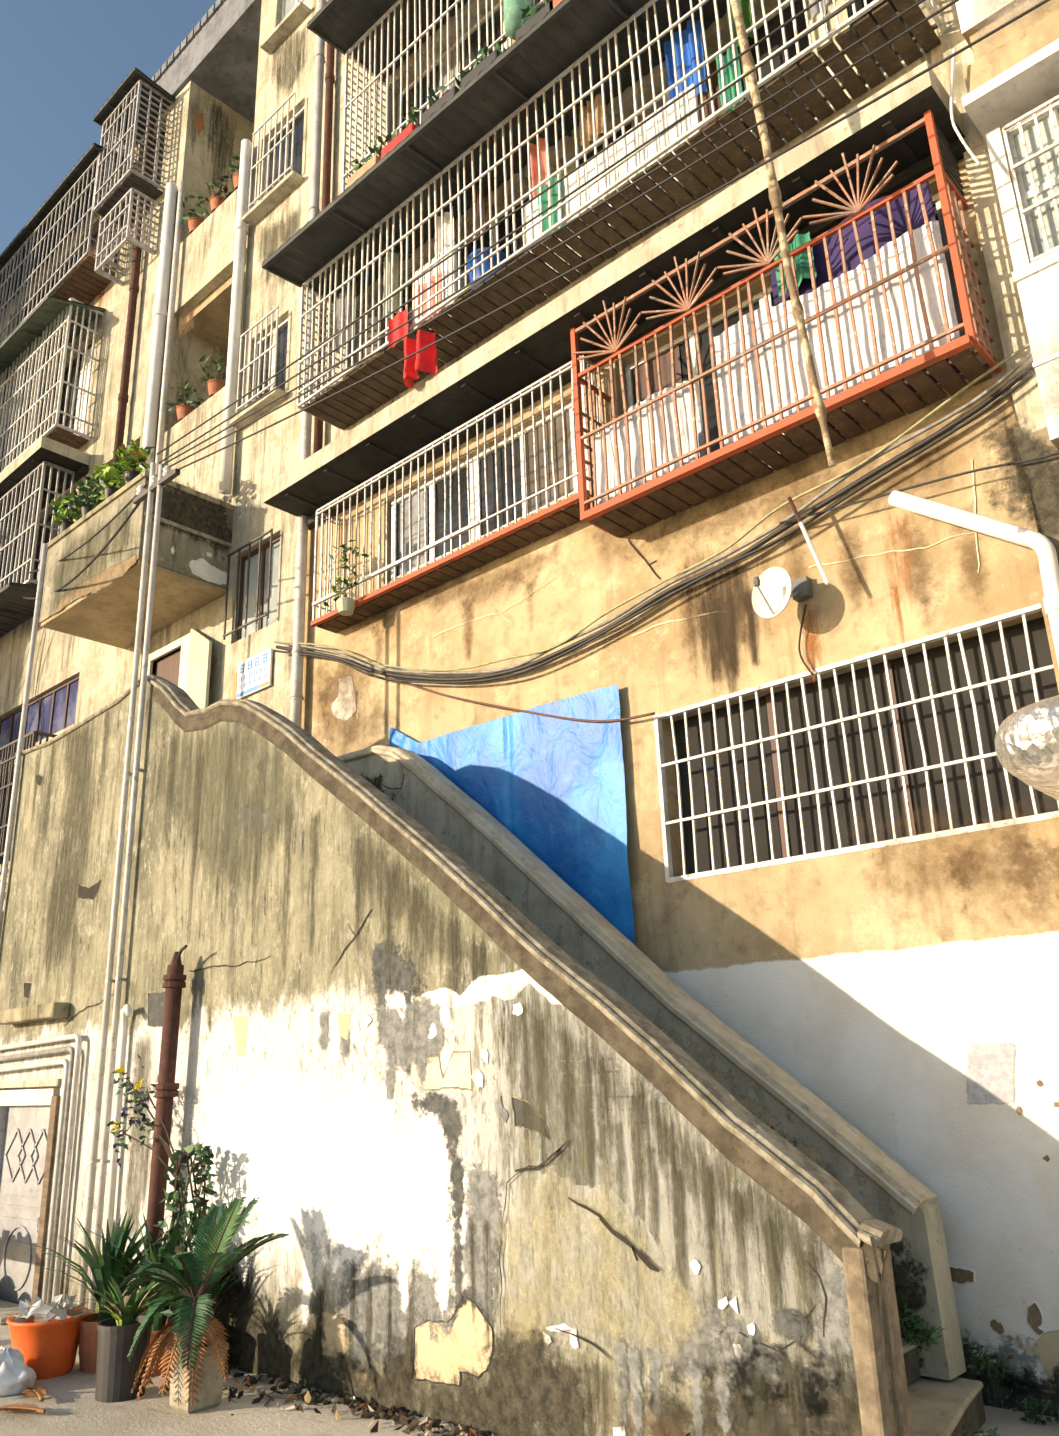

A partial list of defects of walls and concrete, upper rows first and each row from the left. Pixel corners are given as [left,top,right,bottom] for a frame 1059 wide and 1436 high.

damp [982,410,1059,535]
flaking render [171,546,227,585]
crack [628,539,661,579]
damp [682,563,757,685]
damp [151,723,300,959]
peeling [337,969,562,1097]
damp [212,812,863,1436]
crack [515,1140,569,1172]
crack [568,1197,659,1272]
peeling [318,1246,495,1387]
mould [957,1332,1059,1418]
spalling [990,1301,1059,1387]